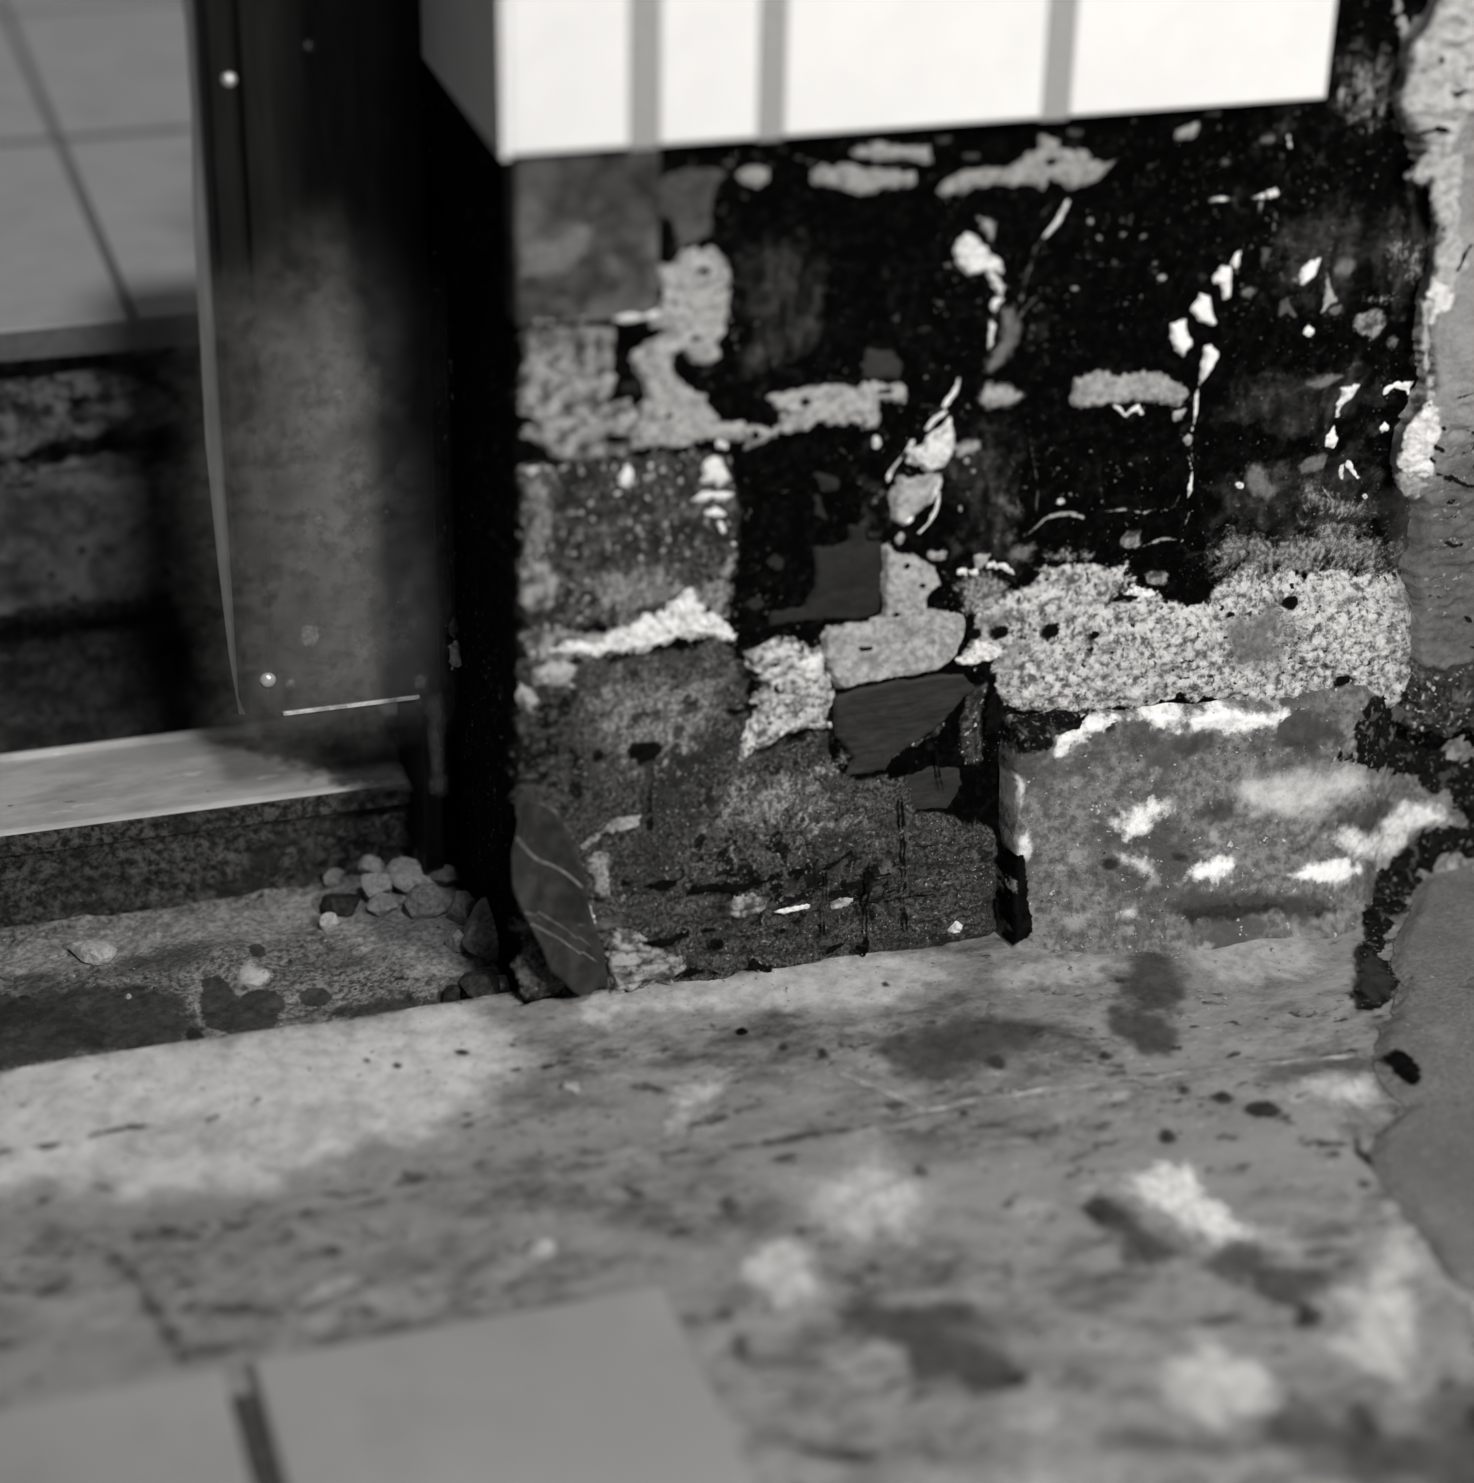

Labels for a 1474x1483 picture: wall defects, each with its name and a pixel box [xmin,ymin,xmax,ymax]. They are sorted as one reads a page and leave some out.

peeling [812,137,951,195]
peeling [937,129,1114,197]
spalling [517,286,664,422]
peeling [946,218,1020,371]
peeling [1170,251,1253,356]
leakage [1335,259,1355,275]
leakage [1353,297,1397,346]
leakage [1387,241,1427,277]
leakage [1191,379,1201,431]
spalling [748,378,975,626]
leakage [928,551,1015,614]
spalling [505,561,1474,1000]